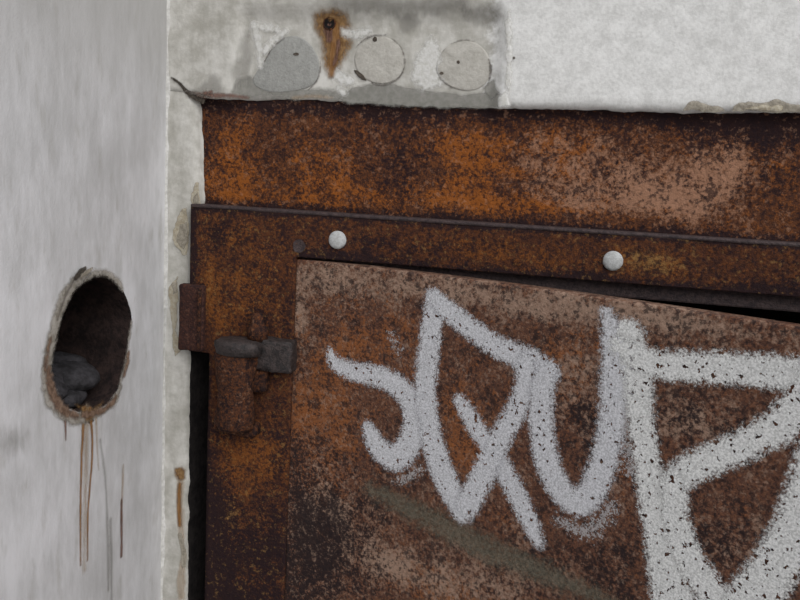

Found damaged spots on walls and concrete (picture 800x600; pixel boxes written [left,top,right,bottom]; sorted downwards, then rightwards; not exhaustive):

corrosion [314,9,351,77]
spalling [41,270,132,425]
corrosion [80,406,98,565]
corrosion [175,467,186,567]